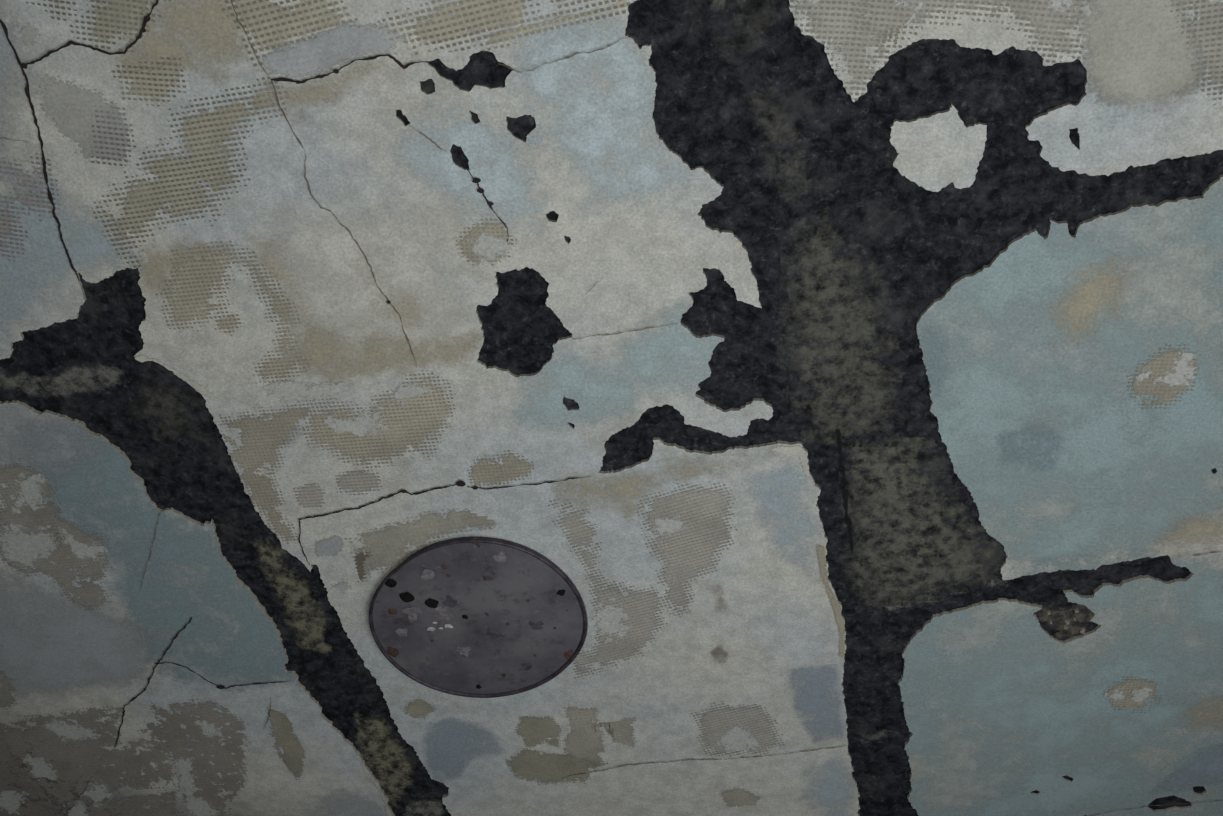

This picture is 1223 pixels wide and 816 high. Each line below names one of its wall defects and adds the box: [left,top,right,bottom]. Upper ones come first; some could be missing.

peeling [26,0,170,52]
peeling [112,57,186,107]
crack [498,37,627,73]
crack [0,0,159,281]
crack [231,0,424,366]
crack [410,126,509,242]
crack [572,323,679,340]
spalling [0,73,455,816]
spalling [389,0,1223,816]
peeling [315,509,496,582]
crack [299,476,591,565]